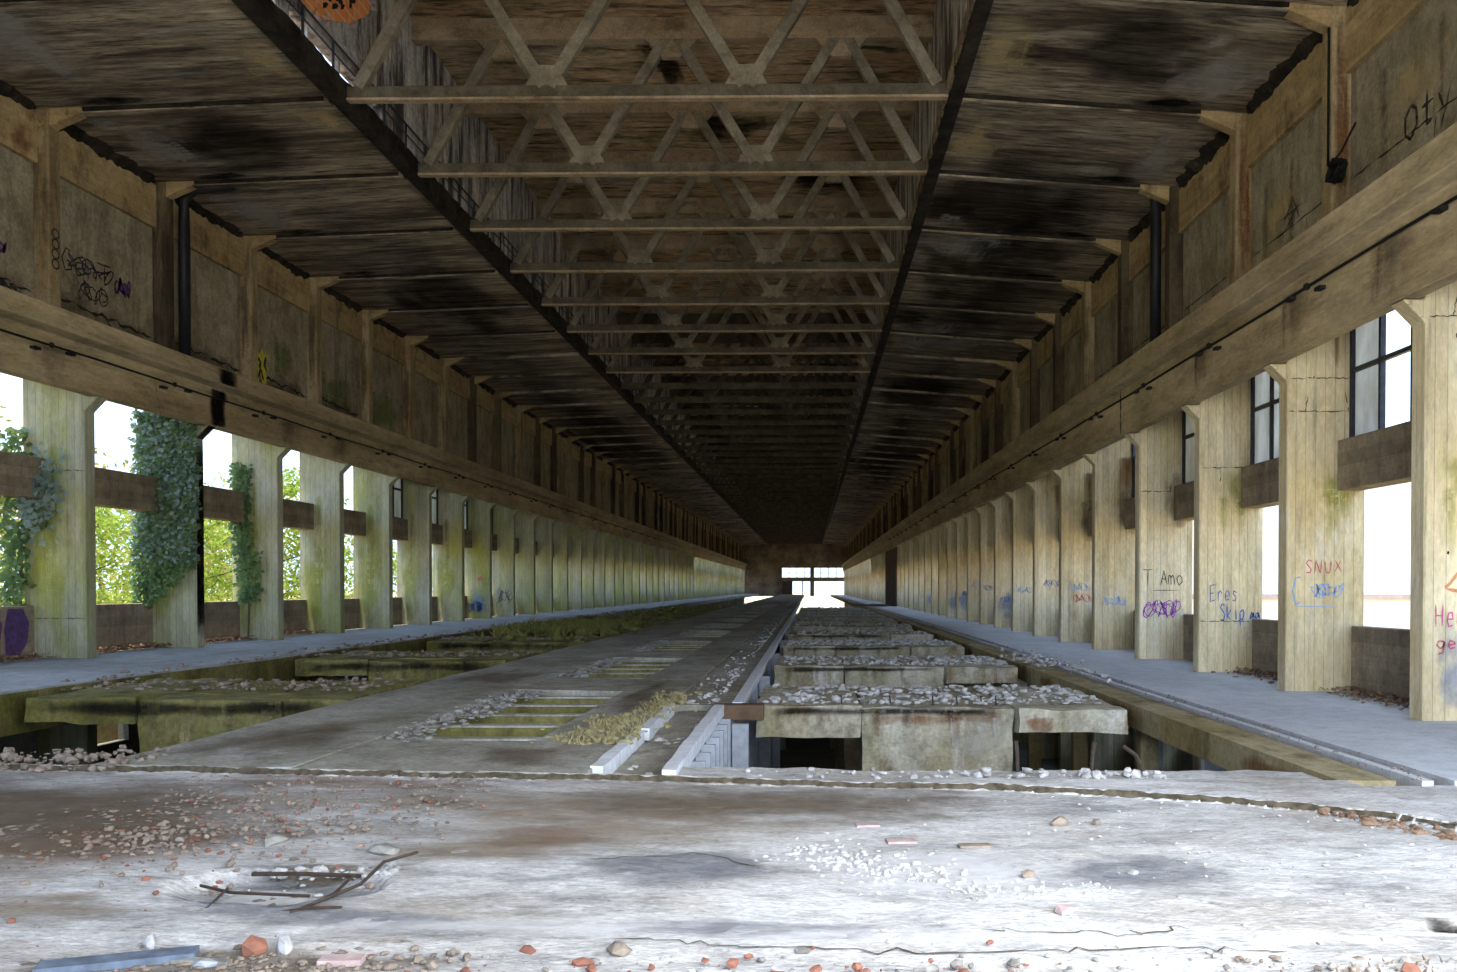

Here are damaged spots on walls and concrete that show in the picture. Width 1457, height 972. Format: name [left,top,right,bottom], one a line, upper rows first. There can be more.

water stain [1142,99,1191,107]